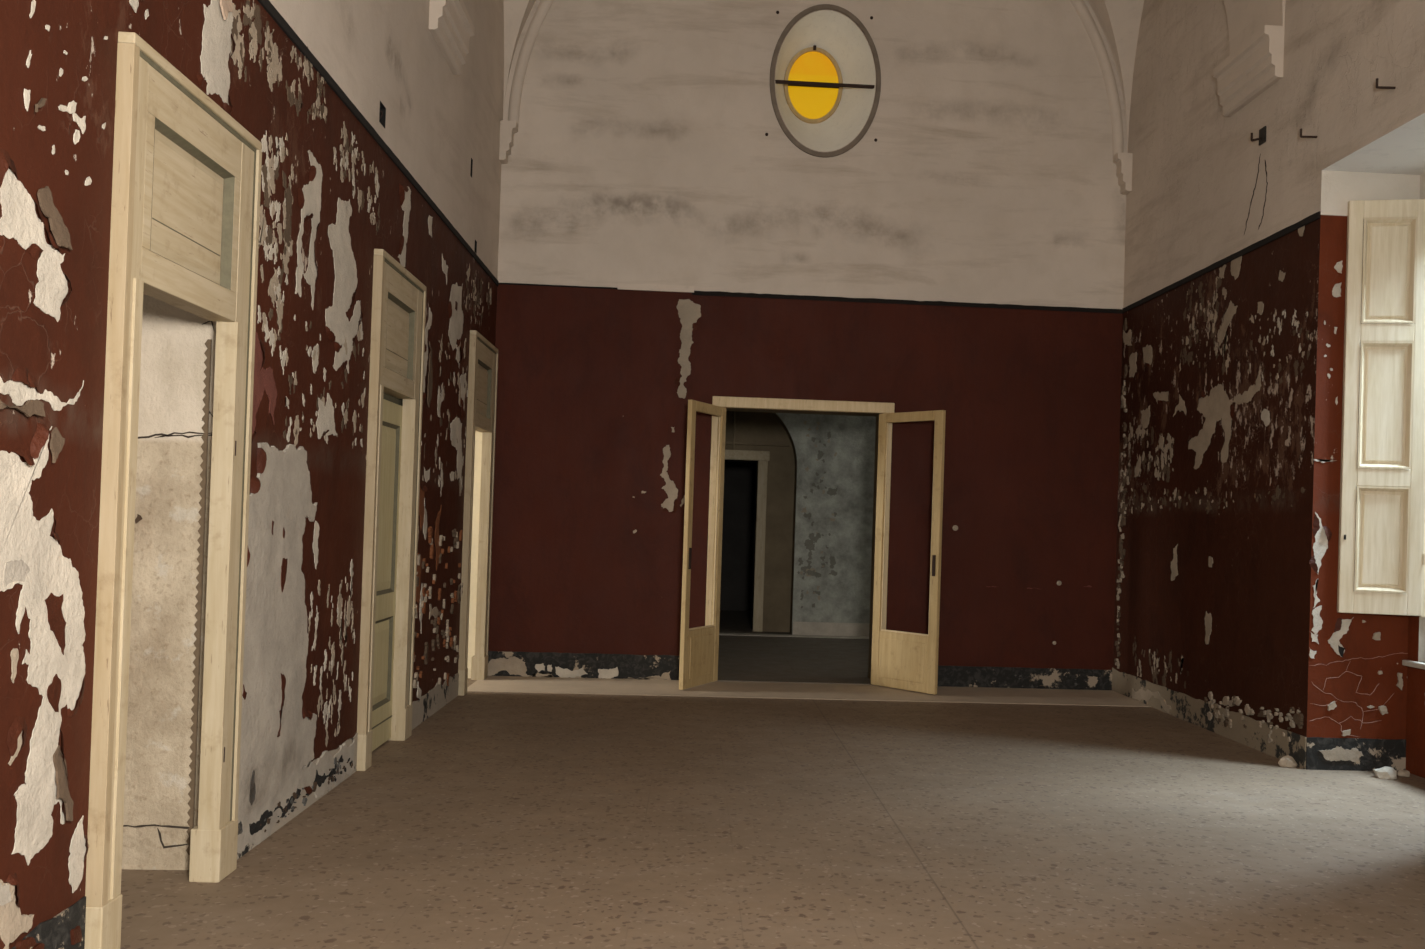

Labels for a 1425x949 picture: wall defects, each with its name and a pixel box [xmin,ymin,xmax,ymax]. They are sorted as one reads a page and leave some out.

peeling [0,147,73,322]
spalling [674,299,701,399]
crack [138,411,213,439]
peeling [196,0,380,853]
peeling [413,240,492,699]
peeling [633,427,685,514]
peeling [1114,256,1337,713]
peeling [0,365,89,949]
spalling [488,657,671,680]
spalling [1319,729,1363,762]
peeling [1309,512,1381,658]
crack [1310,653,1408,737]